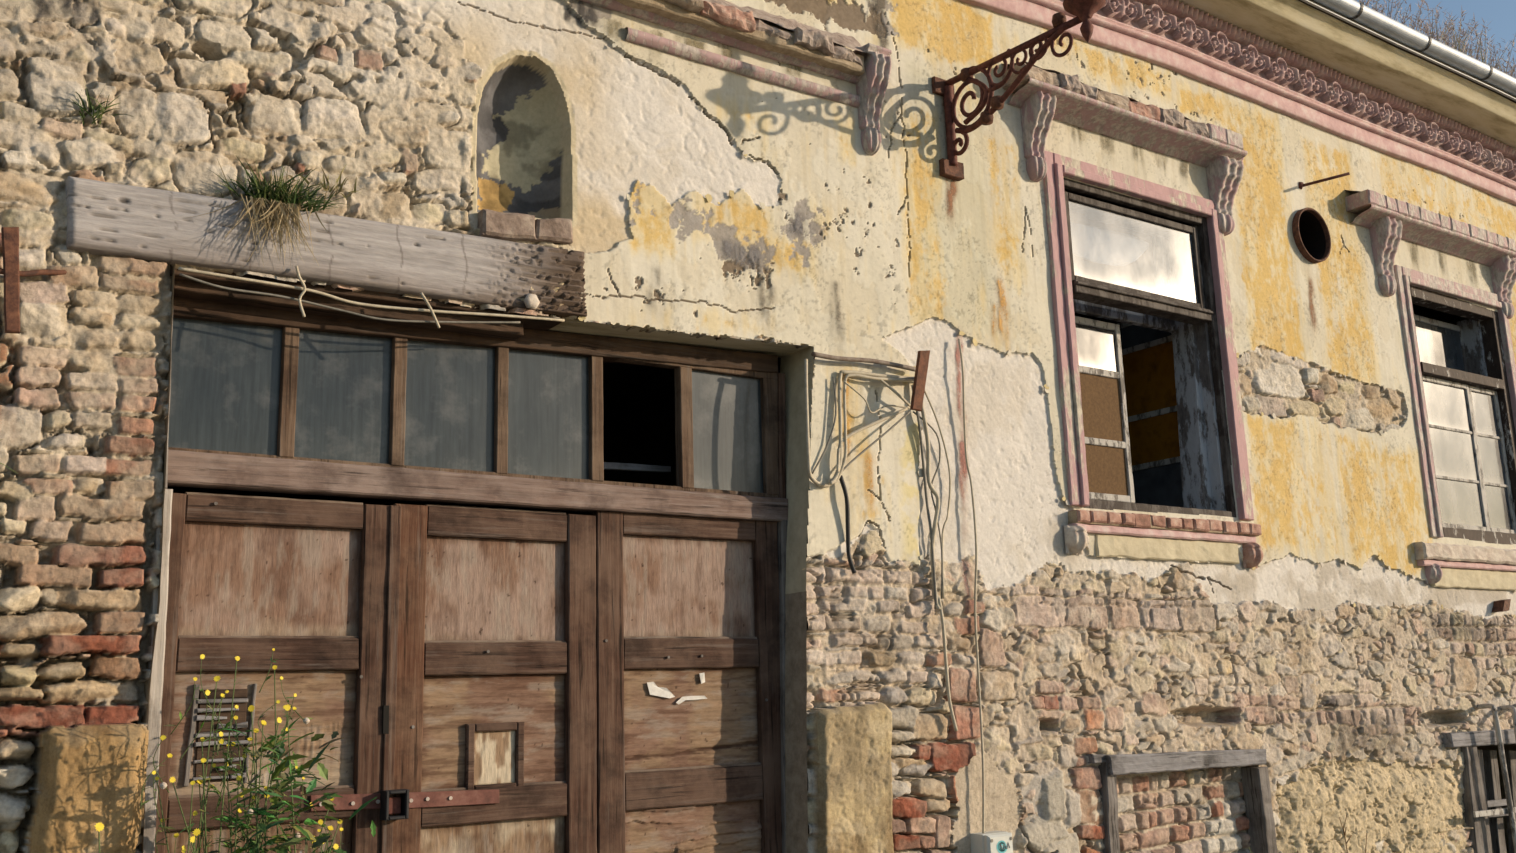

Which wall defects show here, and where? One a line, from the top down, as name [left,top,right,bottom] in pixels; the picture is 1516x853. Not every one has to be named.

crack [458,1,783,201]
crack [887,31,912,277]
crack [584,267,776,313]
spalling [366,0,1516,853]
corrosion [959,442,967,493]